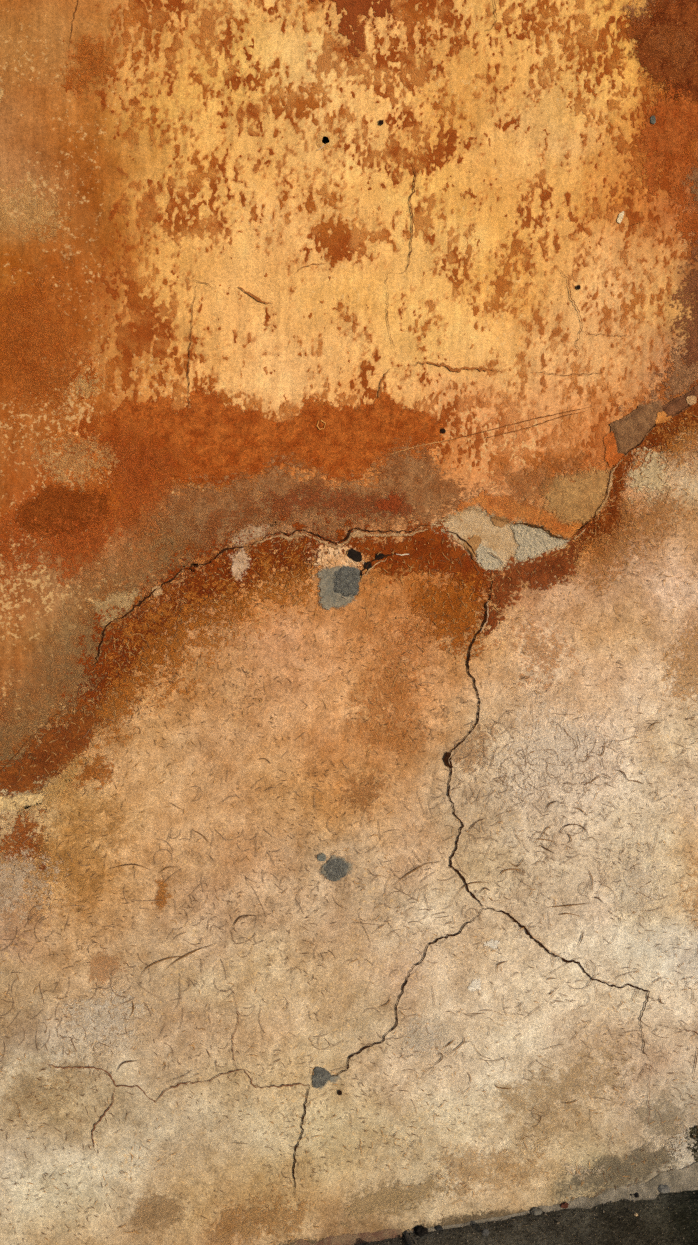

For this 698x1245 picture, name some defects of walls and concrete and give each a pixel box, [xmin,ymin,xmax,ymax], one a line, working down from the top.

peeling [60,0,698,572]
crack [572,407,686,540]
crack [41,525,698,1194]